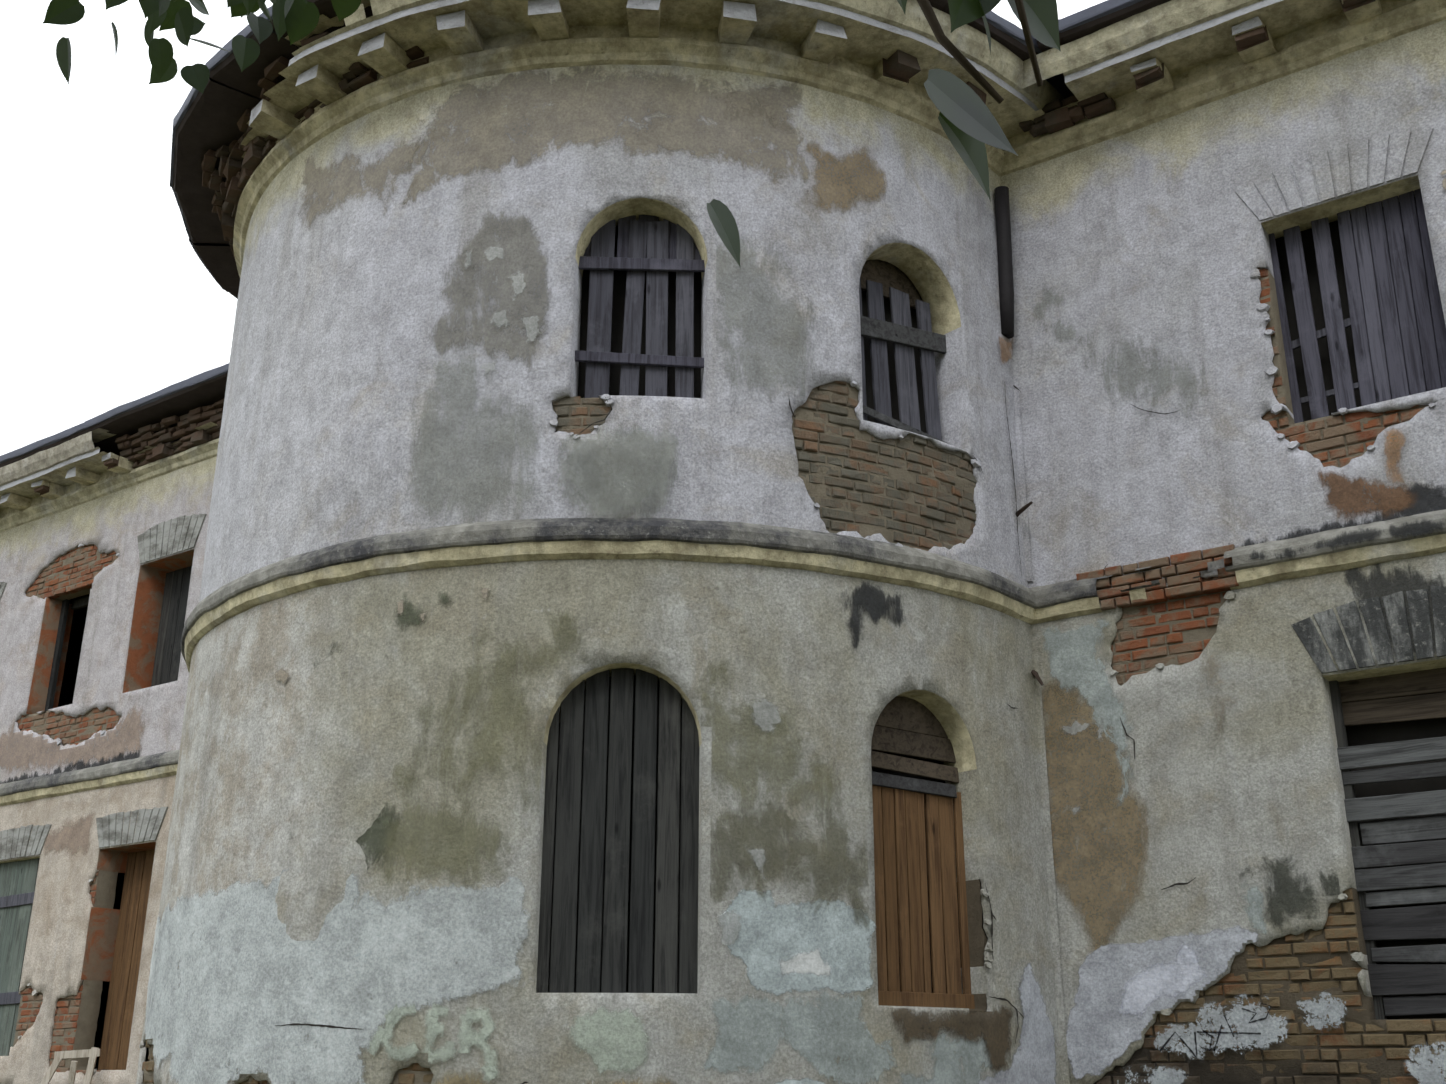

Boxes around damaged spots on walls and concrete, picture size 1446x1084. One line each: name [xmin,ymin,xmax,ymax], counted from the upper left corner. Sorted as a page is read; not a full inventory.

leakage [301,66,886,225]
leakage [434,212,549,368]
flaking render [1250,268,1436,468]
flaking render [792,381,981,551]
flaking render [1076,544,1239,686]
flaking render [16,707,122,746]
leakage [356,773,498,876]
leakage [704,668,869,918]
leakage [1042,680,1148,950]
leakage [1264,858,1340,926]
flaking render [13,980,103,1075]
flaking render [1093,888,1446,1084]